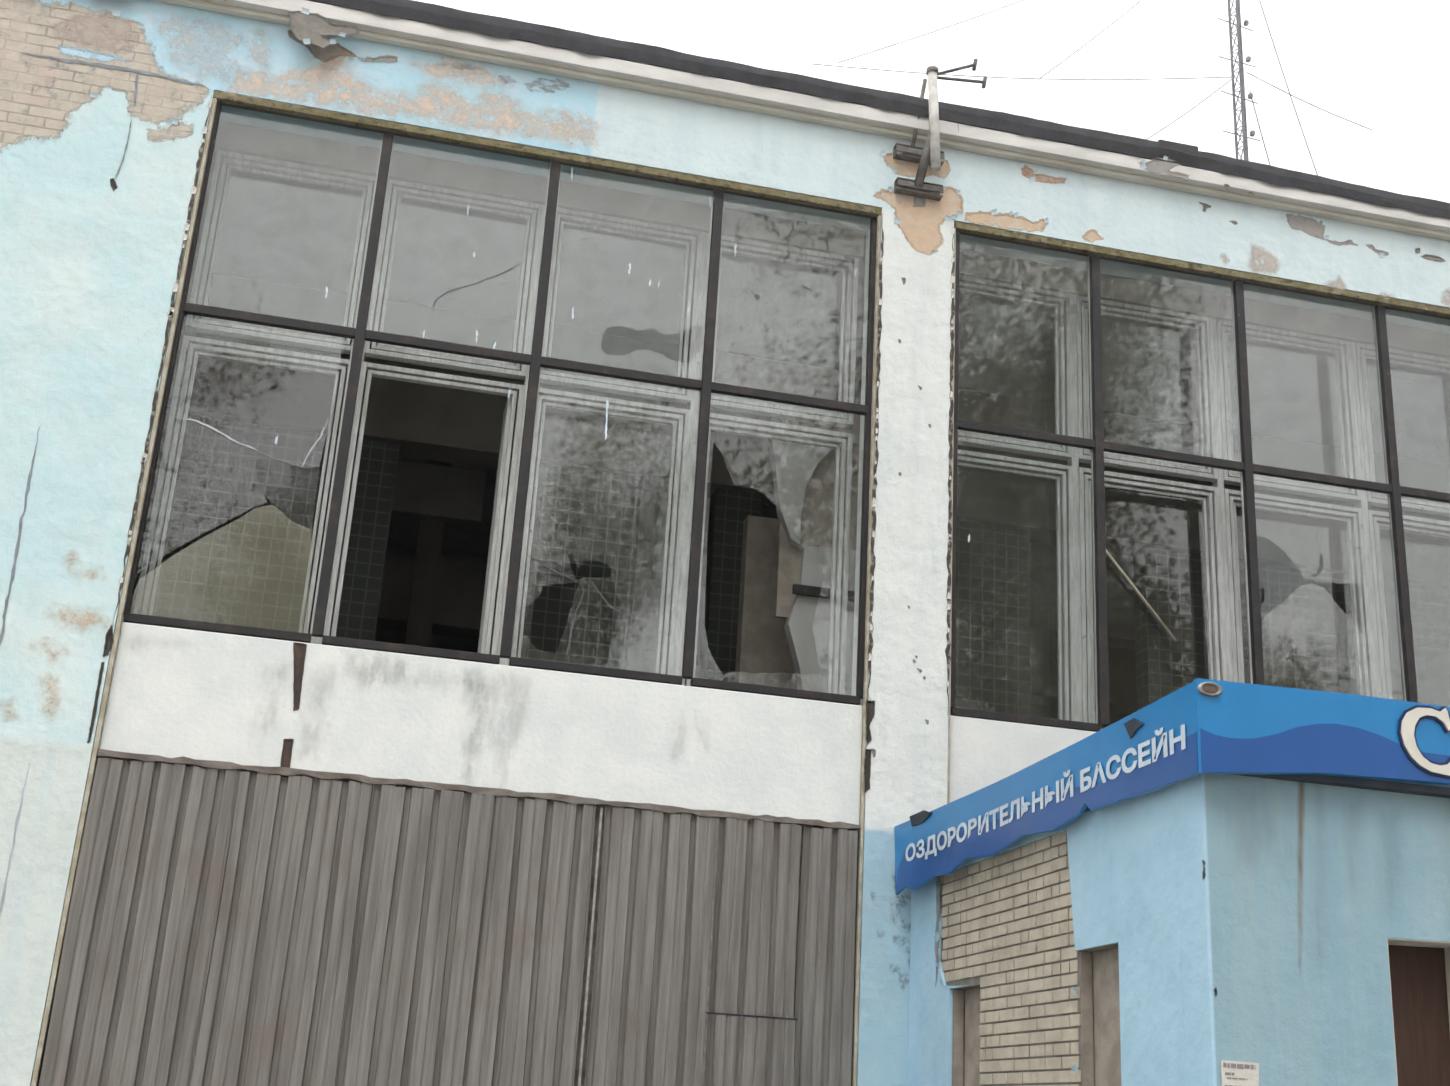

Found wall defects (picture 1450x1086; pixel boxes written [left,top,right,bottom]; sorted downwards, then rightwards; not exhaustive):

peeling [234,30,594,142]
peeling [1019,163,1067,184]
peeling [1082,229,1104,243]
peeling [1251,246,1277,272]
spalling [1286,212,1389,257]
peeling [0,0,212,743]
spalling [864,150,1049,793]
crack [0,427,40,645]
spalling [293,642,307,711]
crack [0,766,29,915]